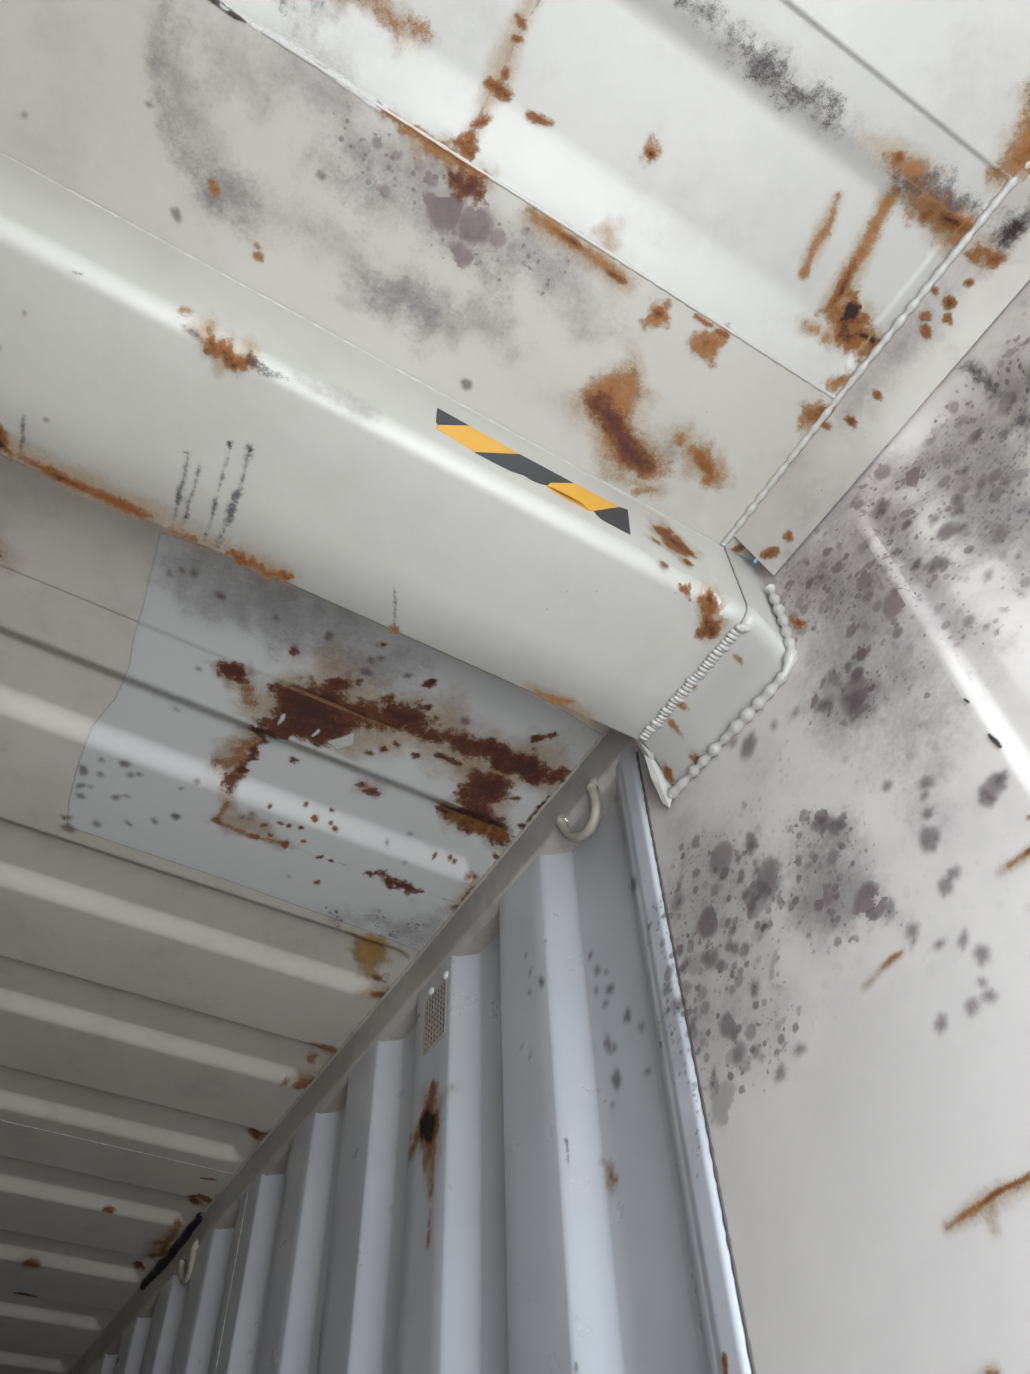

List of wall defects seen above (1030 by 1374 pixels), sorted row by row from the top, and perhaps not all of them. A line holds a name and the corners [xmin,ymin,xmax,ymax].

leakage [728,32,838,125]
leakage [208,178,221,195]
leakage [414,195,463,229]
rust [798,151,980,431]
rust [203,326,255,371]
leakage [969,335,1030,399]
rust [583,368,671,495]
rust [653,525,696,568]
leakage [806,400,1030,712]
rust [679,583,721,639]
rust [211,660,575,859]
leakage [656,809,897,1095]